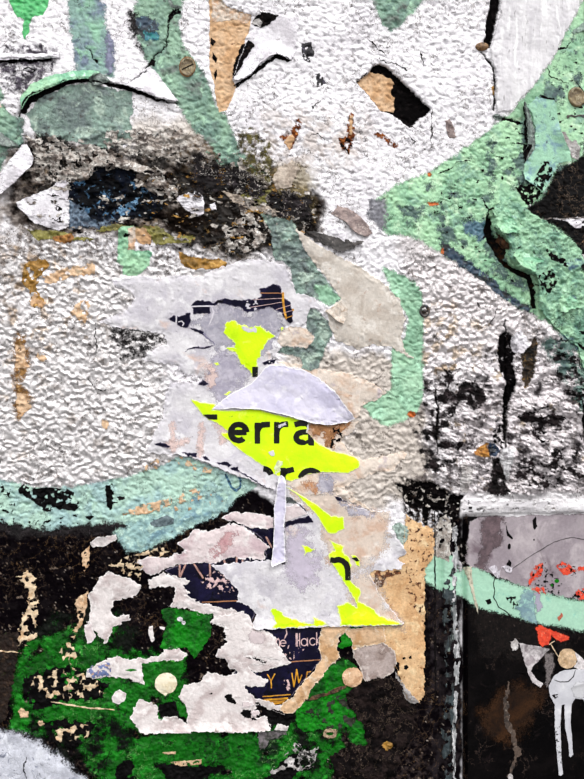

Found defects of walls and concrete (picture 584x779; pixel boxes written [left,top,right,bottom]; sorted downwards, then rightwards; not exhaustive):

crack [480,0,522,125]
spalling [356,65,430,128]
corrosion [279,118,302,150]
corrosion [338,112,355,155]
peeling [143,457,214,476]
peeling [105,483,125,510]
peeling [123,488,212,516]
peeling [392,522,409,546]
spalling [397,481,468,564]
peeling [82,545,90,572]
peeling [109,548,170,581]